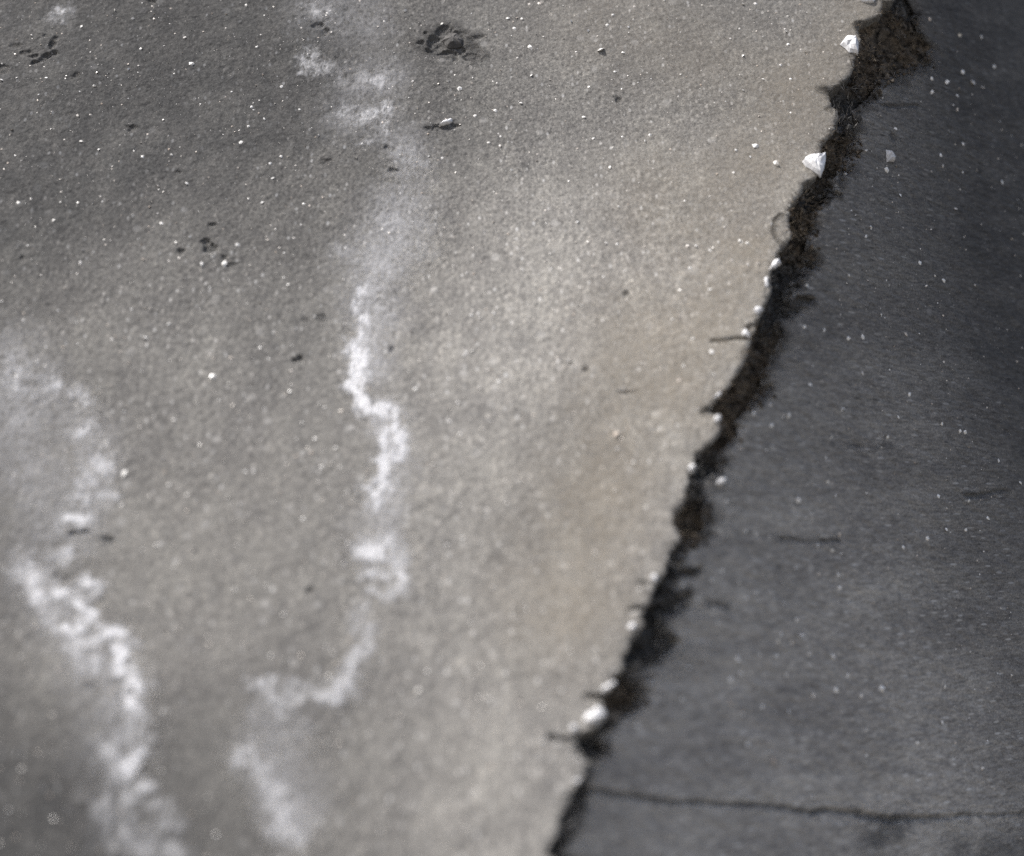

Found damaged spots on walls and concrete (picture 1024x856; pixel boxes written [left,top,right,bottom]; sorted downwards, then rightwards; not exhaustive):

damp [343,285,409,513]
crack [547,0,971,856]
damp [62,455,115,528]
damp [354,535,407,596]
damp [15,563,145,727]
damp [250,627,373,713]
damp [108,746,153,804]